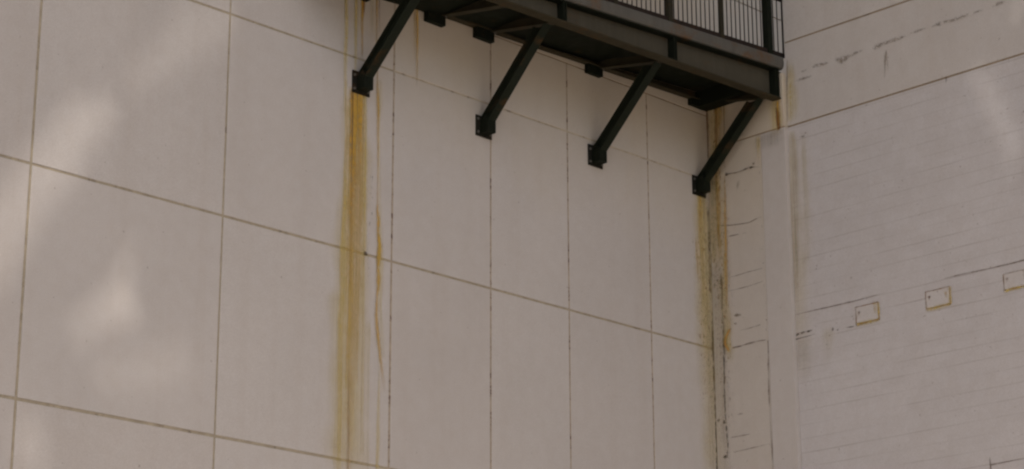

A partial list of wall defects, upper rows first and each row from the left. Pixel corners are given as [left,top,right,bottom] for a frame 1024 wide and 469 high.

rust [344,92,381,352]
leakage [698,172,739,469]